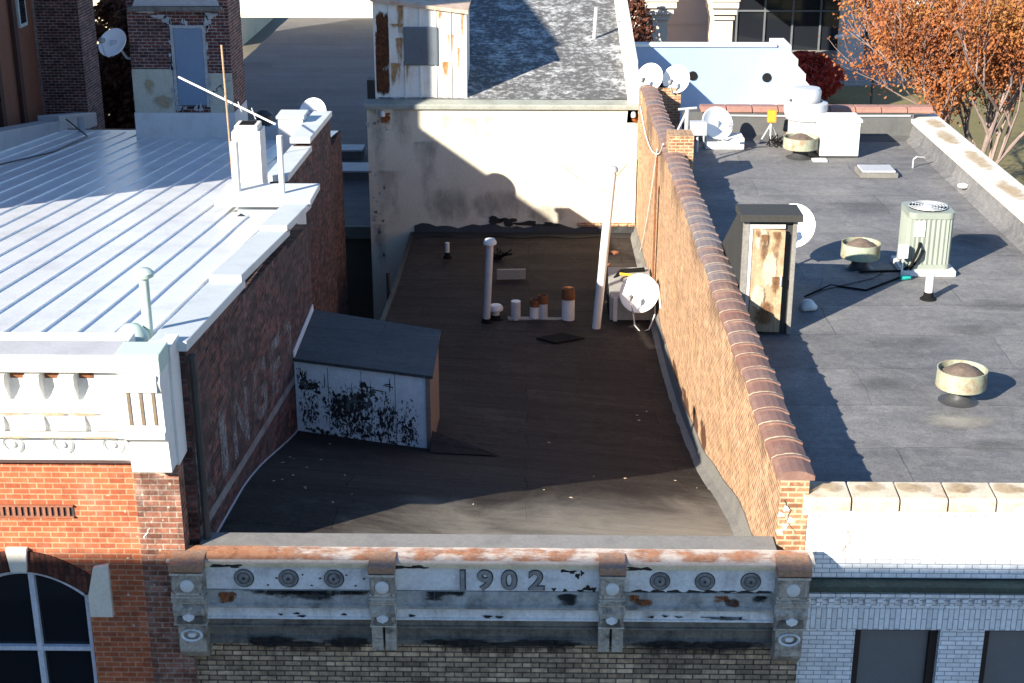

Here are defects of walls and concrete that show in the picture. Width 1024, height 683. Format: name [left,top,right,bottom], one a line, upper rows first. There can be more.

spalling [137,11,188,27]
spalling [202,12,218,60]
damp [926,120,990,169]
damp [998,180,1023,197]
peeling [296,368,420,447]
peeling [186,545,393,586]
peeling [396,548,596,592]
peeling [626,549,662,571]
peeling [677,550,763,562]
corrosion [629,595,652,606]
corrosion [714,596,739,607]